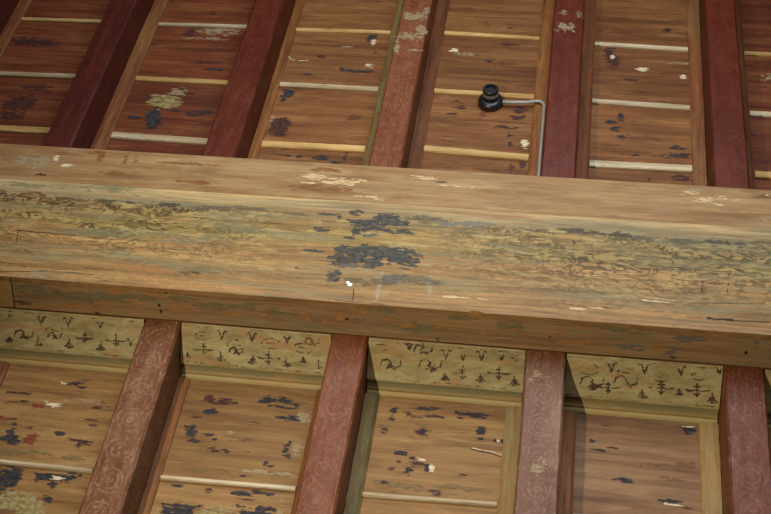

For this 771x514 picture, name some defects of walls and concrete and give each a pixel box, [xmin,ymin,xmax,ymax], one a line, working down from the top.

peeling [128,87,215,129]
peeling [303,210,442,286]
peeling [0,466,82,514]
peeling [0,416,93,461]
peeling [6,381,109,409]
peeling [184,395,238,453]
peeling [239,461,295,477]
peeling [258,395,311,423]
peeling [282,441,305,459]
peeling [381,407,444,434]
peeling [370,450,494,496]
peeling [455,411,503,443]